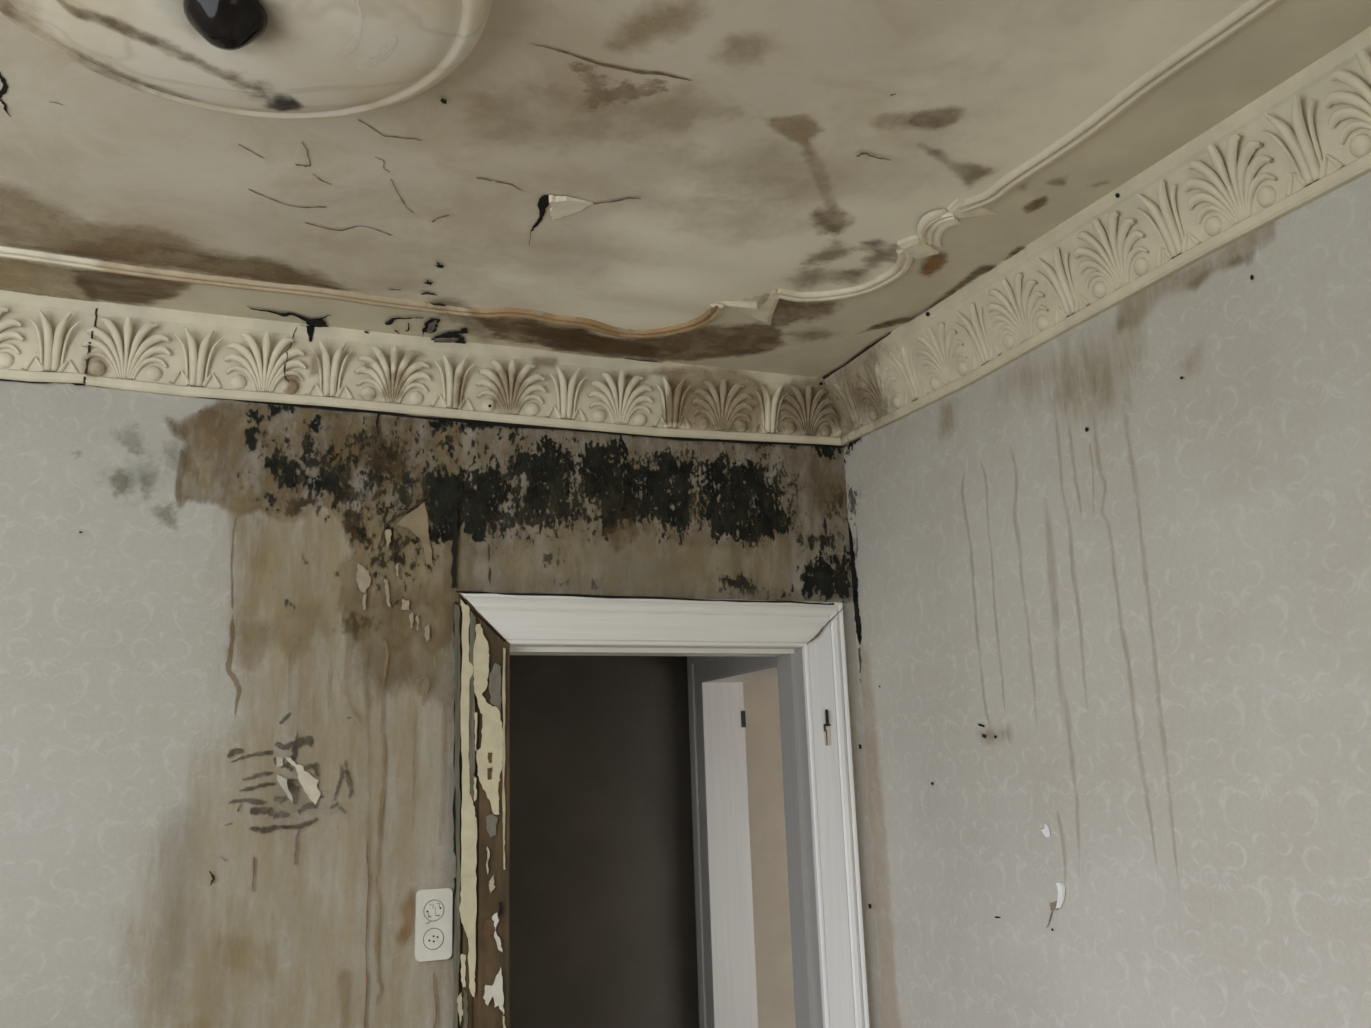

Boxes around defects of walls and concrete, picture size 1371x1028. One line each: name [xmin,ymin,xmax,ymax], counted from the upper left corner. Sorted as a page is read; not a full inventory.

crack [0,73,11,117]
damp [772,116,817,145]
crack [248,119,449,236]
damp [0,189,342,304]
crack [477,178,640,245]
damp [814,212,843,232]
crack [247,306,330,391]
damp [0,379,108,388]
damp [158,248,1025,1028]
peeling [276,756,321,805]
peeling [452,599,506,1028]